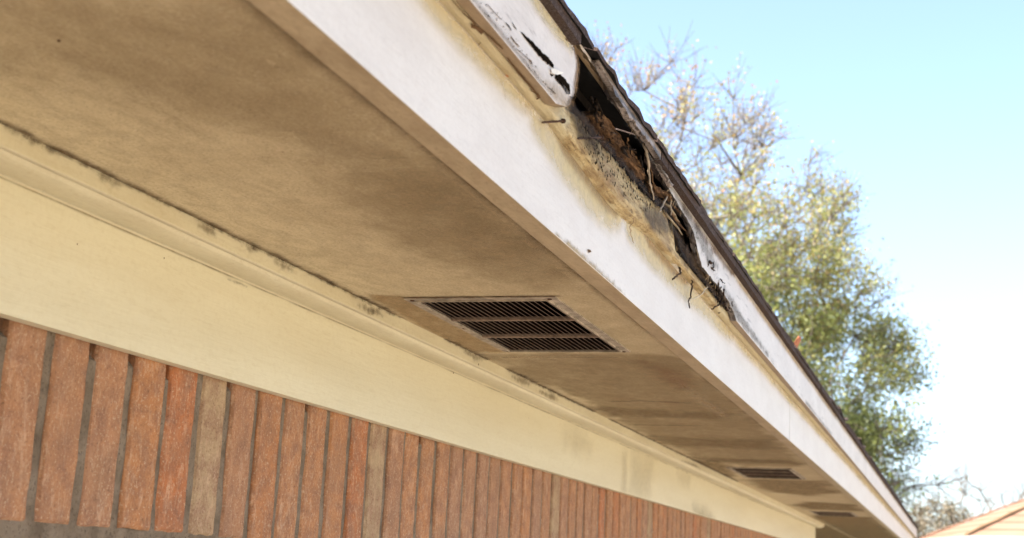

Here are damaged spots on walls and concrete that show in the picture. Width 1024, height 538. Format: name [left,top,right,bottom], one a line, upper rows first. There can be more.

damp [0,121,158,198]
damp [533,0,739,337]
peeling [654,163,674,188]